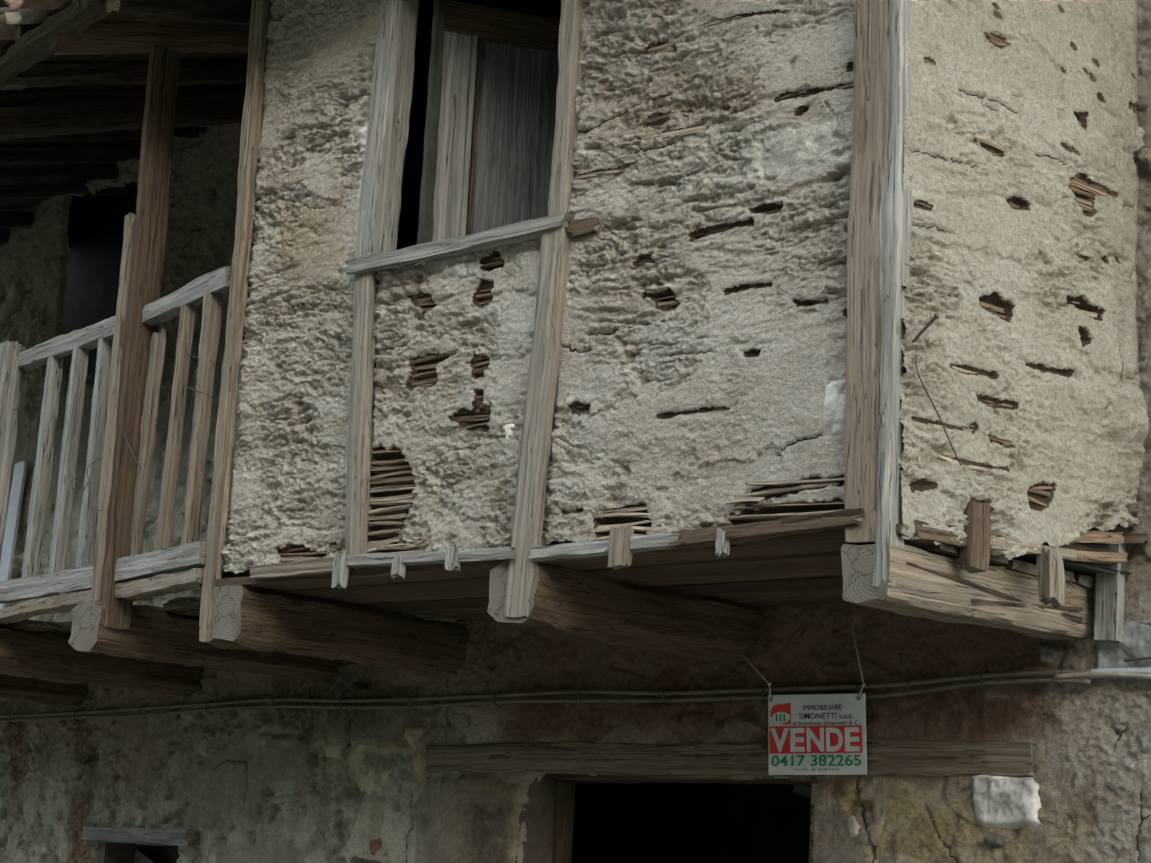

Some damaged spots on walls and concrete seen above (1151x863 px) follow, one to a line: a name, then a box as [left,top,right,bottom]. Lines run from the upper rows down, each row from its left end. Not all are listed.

spalling [1083,58,1107,103]
spalling [1073,111,1089,130]
spalling [1068,173,1119,217]
spalling [979,291,1015,322]
spalling [403,352,457,391]
spalling [447,354,494,432]
spalling [366,446,427,553]
spalling [722,474,845,525]
spalling [1027,481,1057,511]
spalling [561,503,653,541]
crack [856,776,875,863]